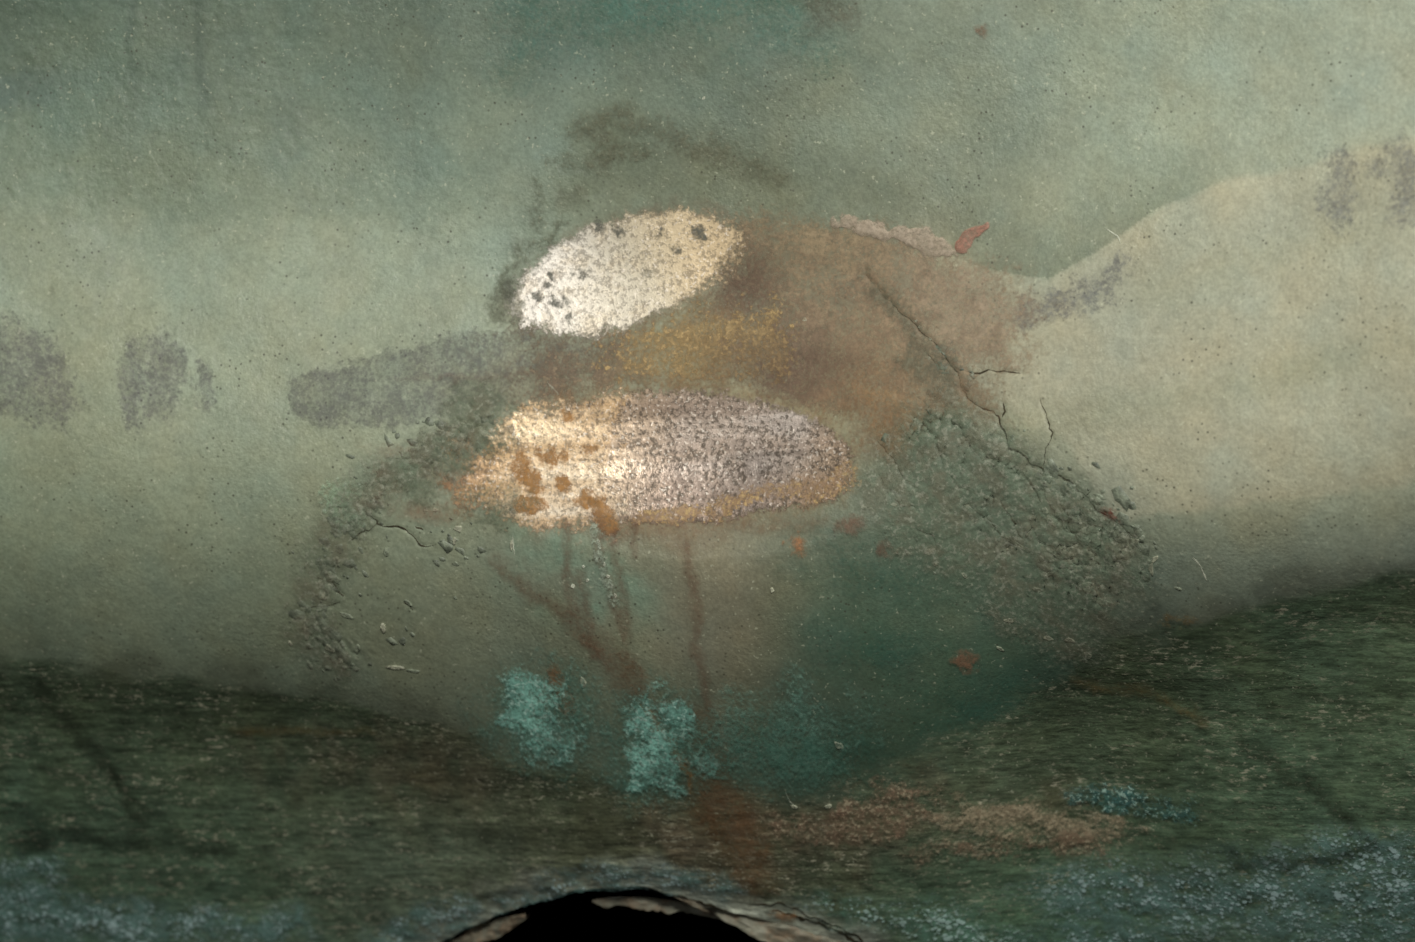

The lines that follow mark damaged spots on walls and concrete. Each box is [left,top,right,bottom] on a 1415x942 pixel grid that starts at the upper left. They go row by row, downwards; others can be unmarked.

spalling [671,224,707,253]
spalling [532,272,572,324]
crack [868,277,1135,591]